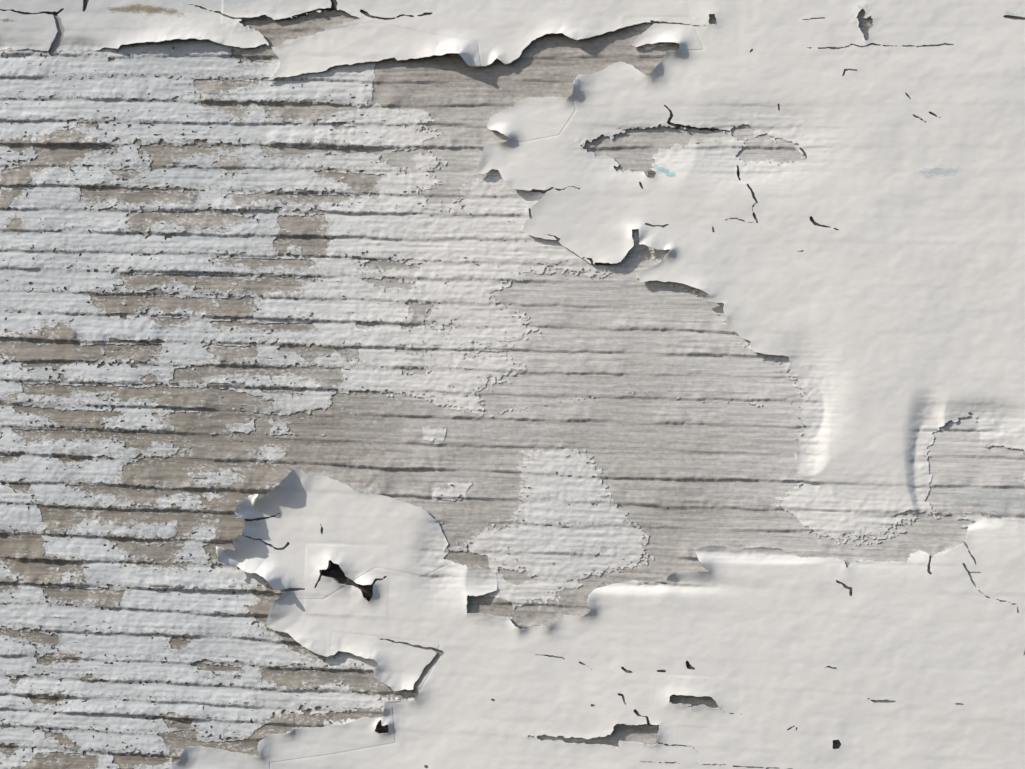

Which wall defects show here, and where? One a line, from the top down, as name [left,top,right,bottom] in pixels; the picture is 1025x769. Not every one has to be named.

peeling [0,118,119,230]
peeling [79,10,702,332]
peeling [581,124,806,178]
peeling [0,248,1025,769]